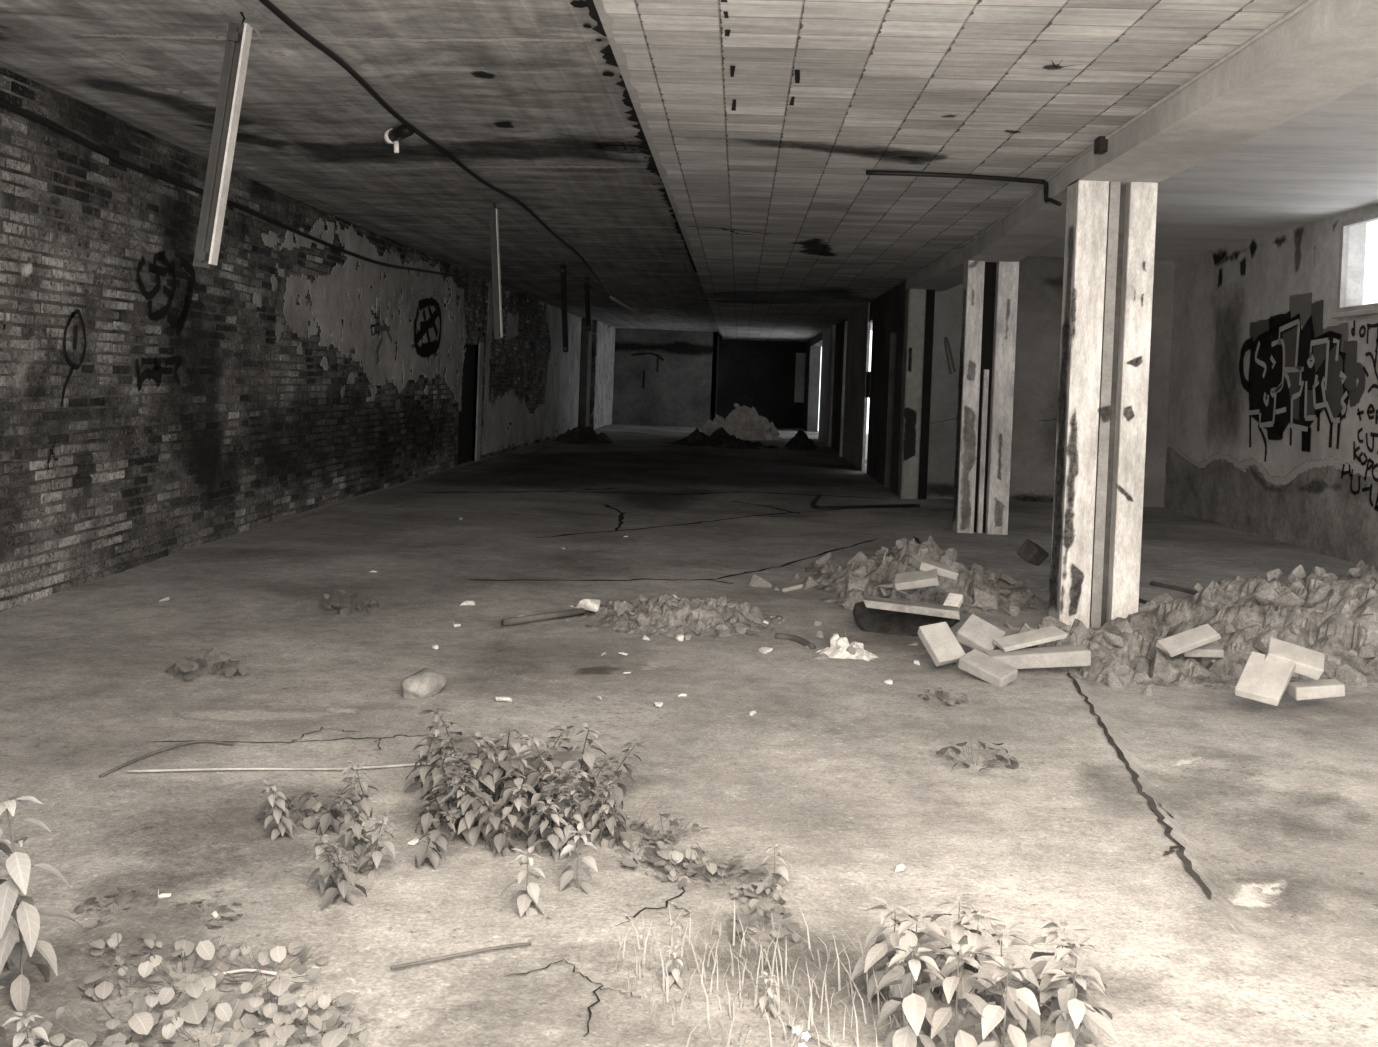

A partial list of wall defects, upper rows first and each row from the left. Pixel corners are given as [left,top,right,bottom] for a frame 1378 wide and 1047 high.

spalling [570,0,697,272]
peeling [253,218,466,411]
peeling [481,281,615,455]
crack [616,873,697,926]
crack [1142,792,1180,855]
crack [505,959,644,1036]